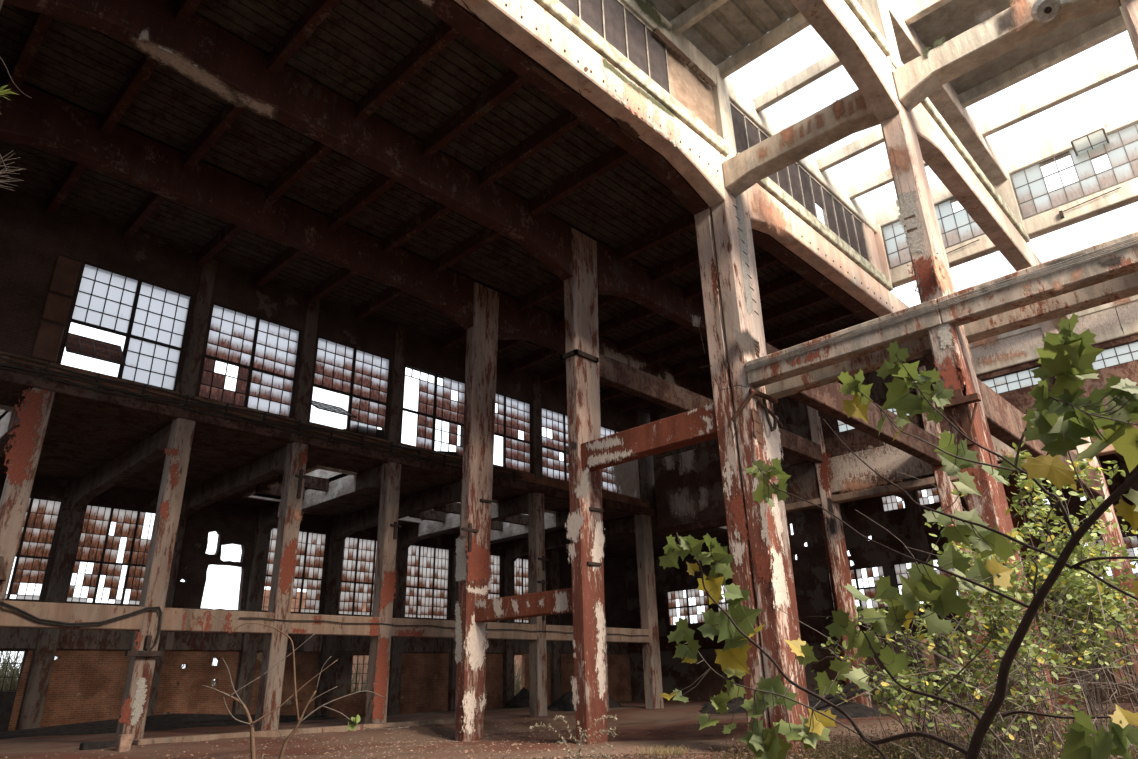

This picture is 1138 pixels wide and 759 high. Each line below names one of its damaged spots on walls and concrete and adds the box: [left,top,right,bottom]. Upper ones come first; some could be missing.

peeling [711,258,720,307]
spalling [732,193,759,315]
corrosion [907,253,952,301]
peeling [565,435,632,571]
peeling [650,403,932,611]
peeling [571,601,608,711]